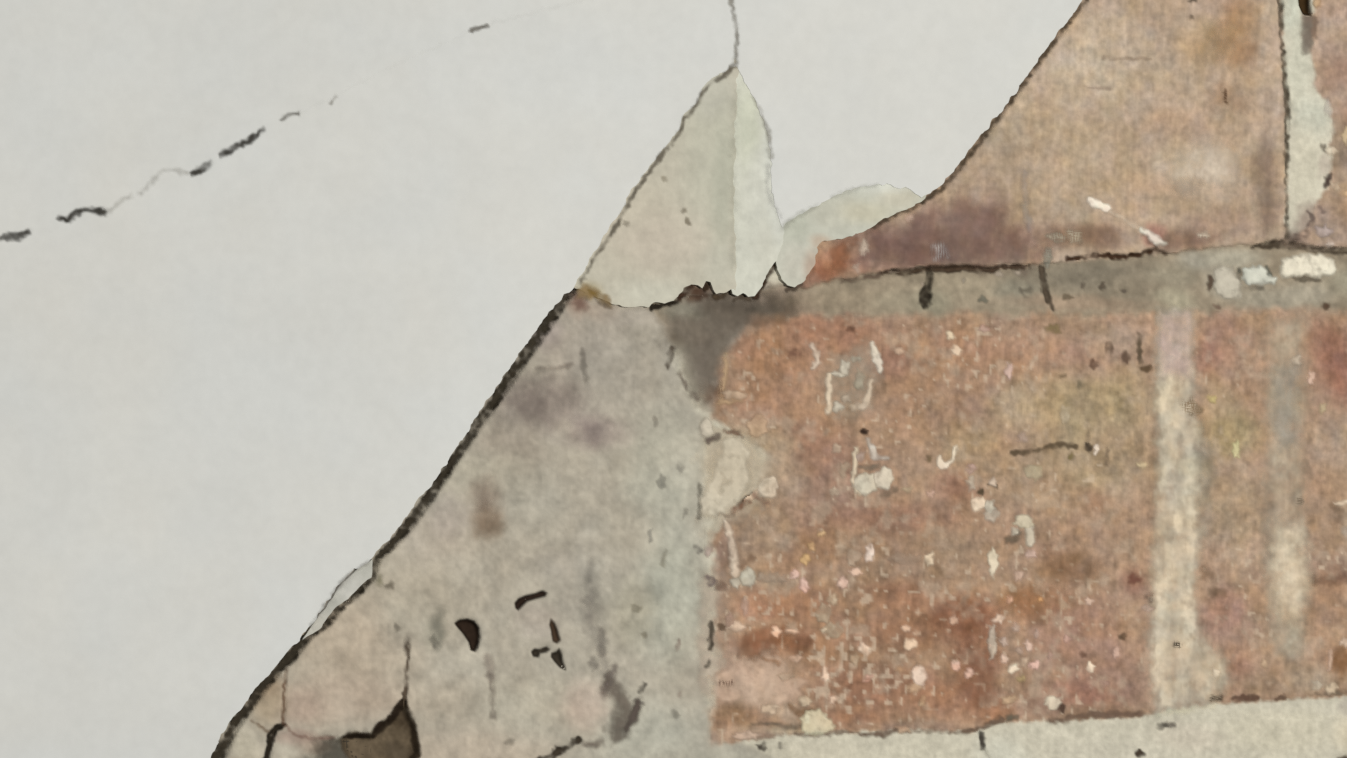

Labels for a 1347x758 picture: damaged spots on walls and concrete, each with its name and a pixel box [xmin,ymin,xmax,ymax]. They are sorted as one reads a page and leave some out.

crack [191,113,299,175]
flaking render [573,58,926,307]
crack [0,208,106,240]
peeling [1214,225,1336,299]
crack [211,0,742,758]
peeling [810,341,904,415]
peeling [831,429,912,496]
peeling [301,559,372,640]
spalling [515,591,546,610]
peeling [699,414,837,734]
spalling [532,620,565,668]
flaking render [341,699,420,758]